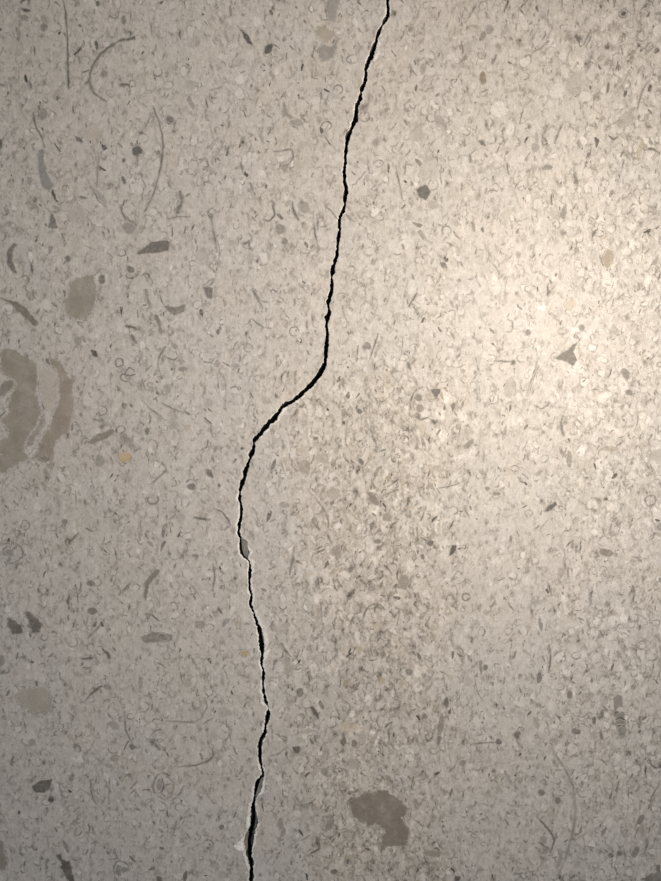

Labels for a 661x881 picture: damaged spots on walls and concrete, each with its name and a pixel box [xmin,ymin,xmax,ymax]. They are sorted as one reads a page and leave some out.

crack [233,0,391,881]